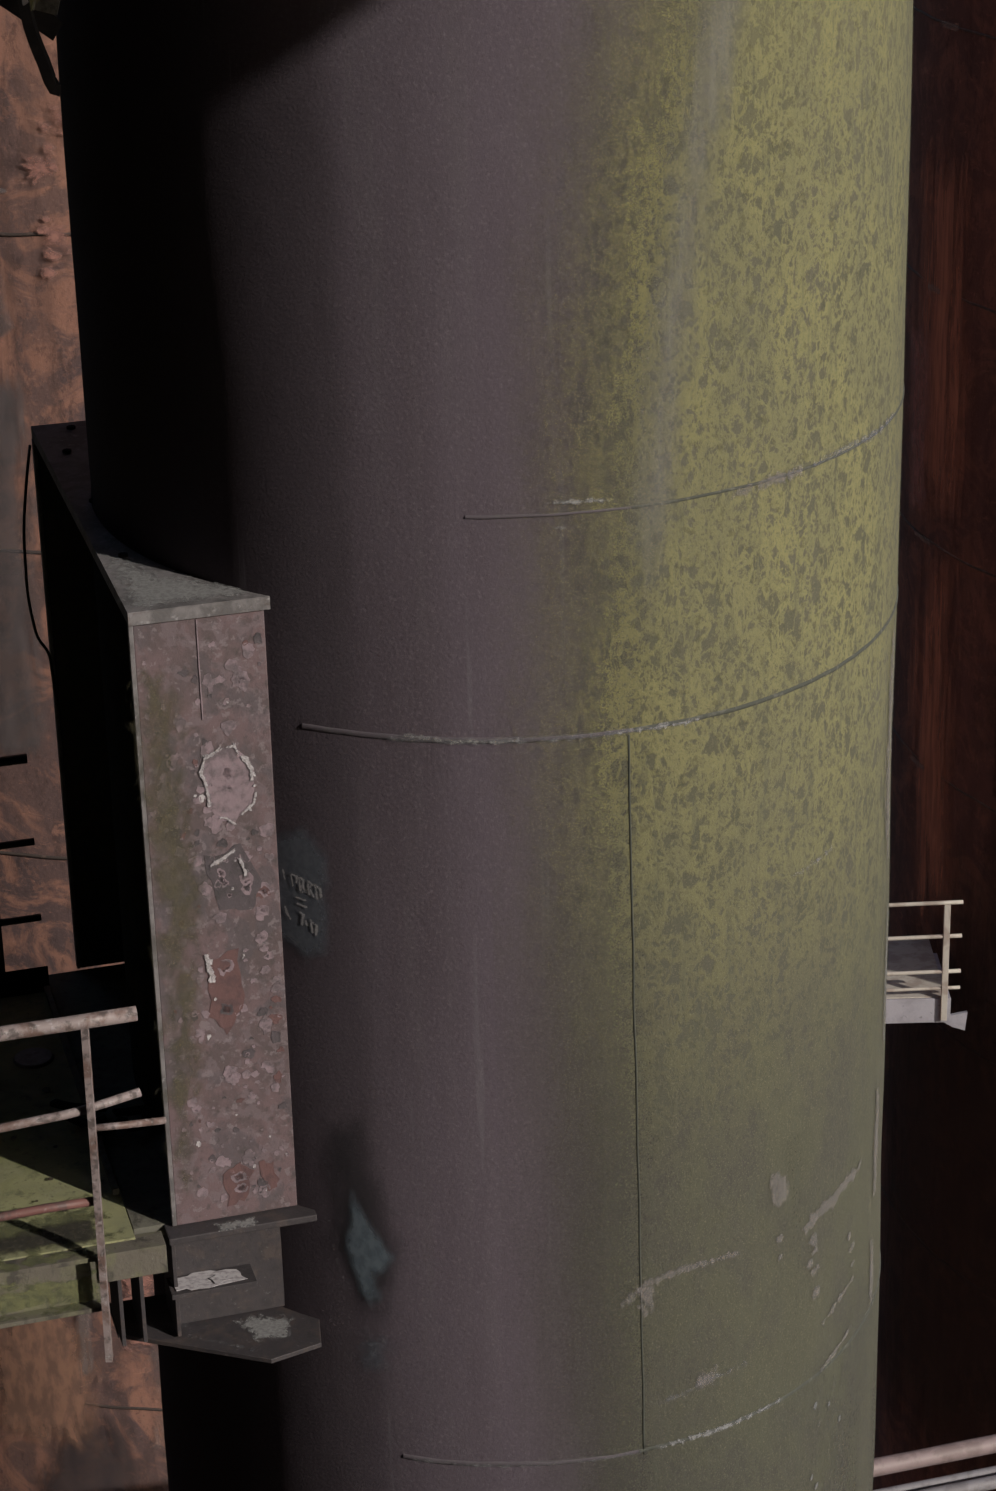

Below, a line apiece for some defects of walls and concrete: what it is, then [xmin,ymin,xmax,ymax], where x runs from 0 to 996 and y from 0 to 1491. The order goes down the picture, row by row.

corrosion [23,106,63,184]
corrosion [37,216,69,278]
corrosion [912,569,947,908]
peeling [142,632,289,1206]